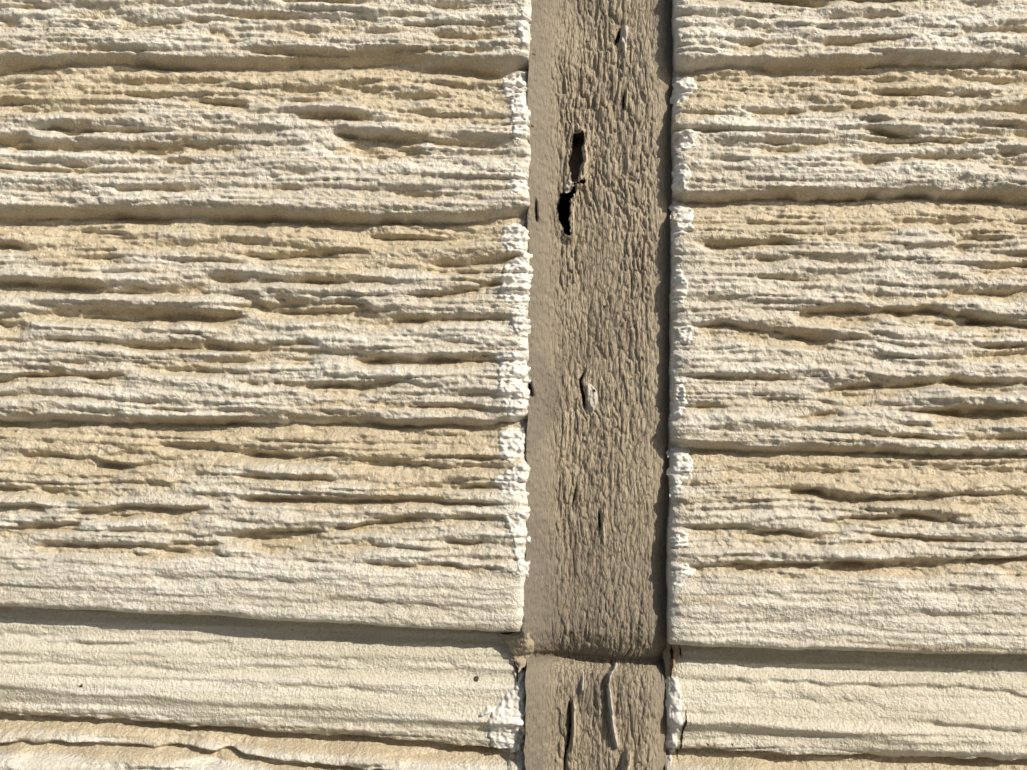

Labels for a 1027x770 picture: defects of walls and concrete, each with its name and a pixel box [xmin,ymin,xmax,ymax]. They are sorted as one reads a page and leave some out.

crack [535,123,588,239]
crack [564,698,576,764]